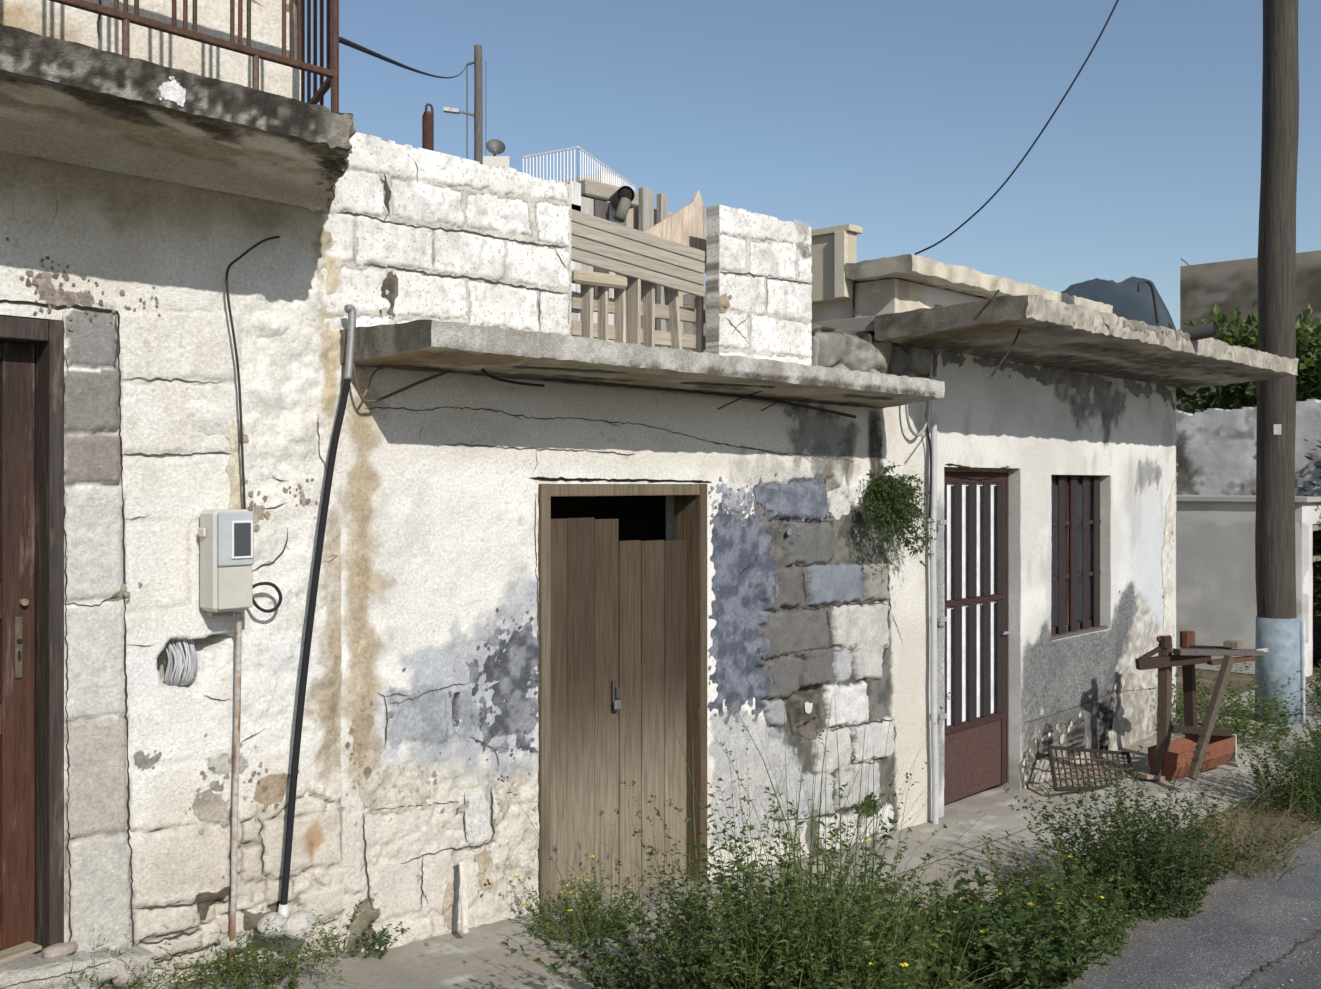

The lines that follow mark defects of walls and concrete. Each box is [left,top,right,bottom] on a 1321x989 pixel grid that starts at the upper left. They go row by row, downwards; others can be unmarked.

leakage [0,71,276,165]
leakage [281,135,351,181]
peeling [20,256,161,331]
leakage [309,387,395,776]
crack [365,406,903,703]
peeling [708,473,856,771]
leakage [388,581,539,779]
peeling [345,608,540,920]
spalling [346,898,380,951]
spalling [442,882,457,930]
crack [1232,930,1321,989]